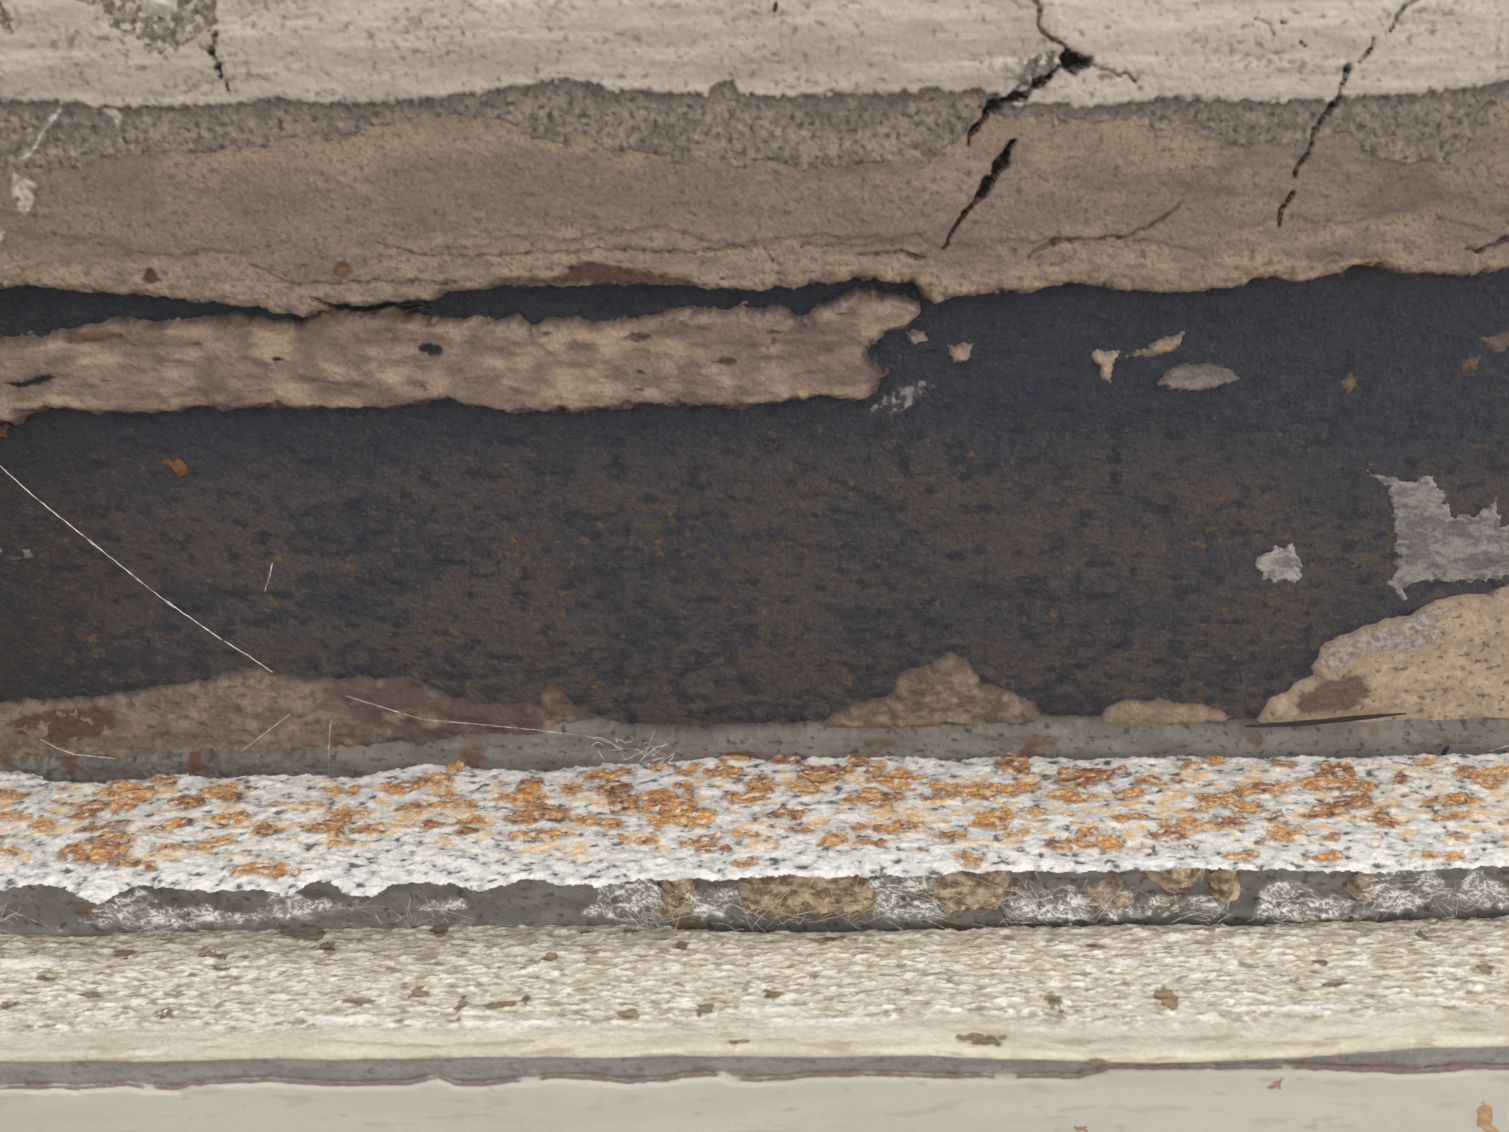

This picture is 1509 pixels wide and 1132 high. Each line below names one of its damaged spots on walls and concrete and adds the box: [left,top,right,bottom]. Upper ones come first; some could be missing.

spalling [76,0,219,55]
crack [1254,17,1307,48]
crack [1277,0,1419,226]
crack [252,5,1137,313]
spalling [419,343,443,355]
spalling [10,374,54,387]
rust [0,752,1509,871]
rust [230,861,300,881]